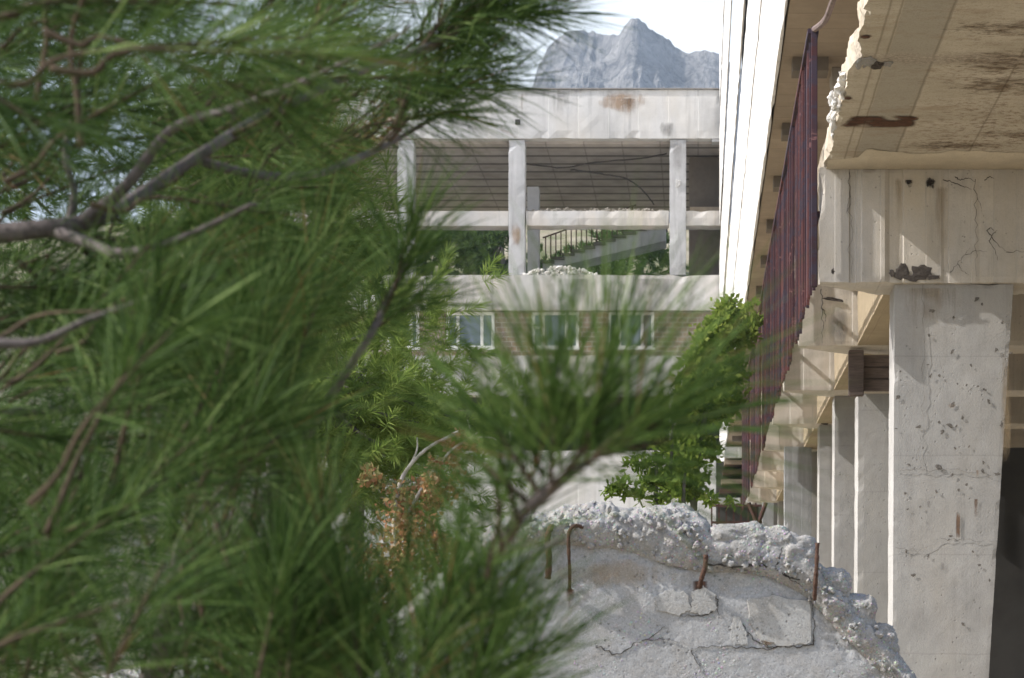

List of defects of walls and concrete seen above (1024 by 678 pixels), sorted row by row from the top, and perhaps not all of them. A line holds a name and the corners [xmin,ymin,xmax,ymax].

spalling [826,56,893,139]
rust [843,116,918,127]
spalling [889,263,939,282]
crack [943,176,1020,276]
spalling [458,500,917,678]
crack [596,547,816,670]